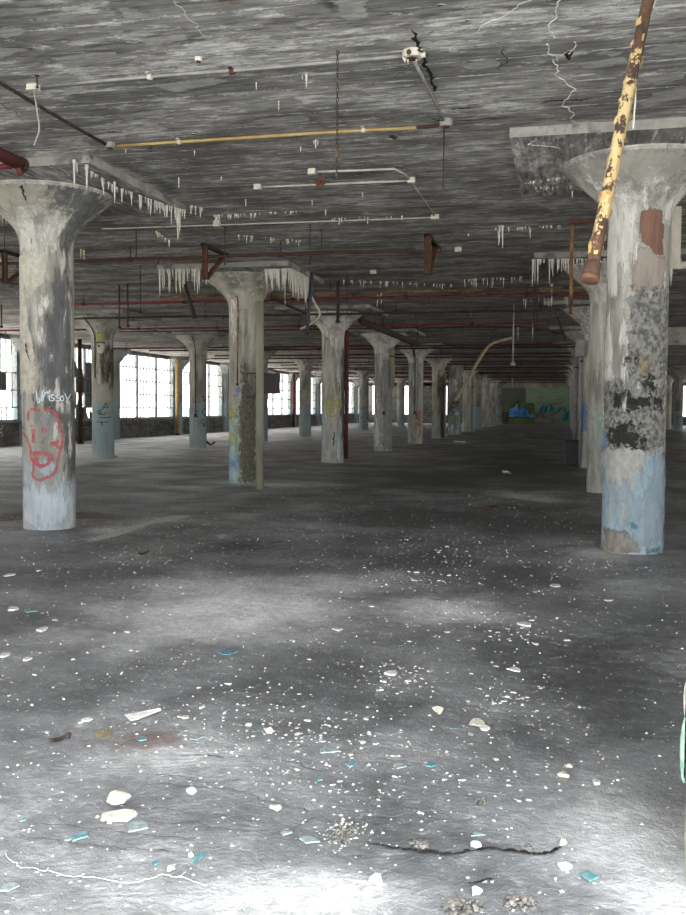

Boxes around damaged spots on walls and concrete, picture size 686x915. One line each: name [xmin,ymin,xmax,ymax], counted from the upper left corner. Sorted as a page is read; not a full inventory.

peeling [334,0,370,20]
crack [478,0,531,31]
crack [411,29,437,93]
crack [541,0,592,122]
crack [432,107,511,122]
peeling [631,208,667,293]
peeling [600,447,645,554]
crack [5,754,323,885]
crack [369,819,562,855]